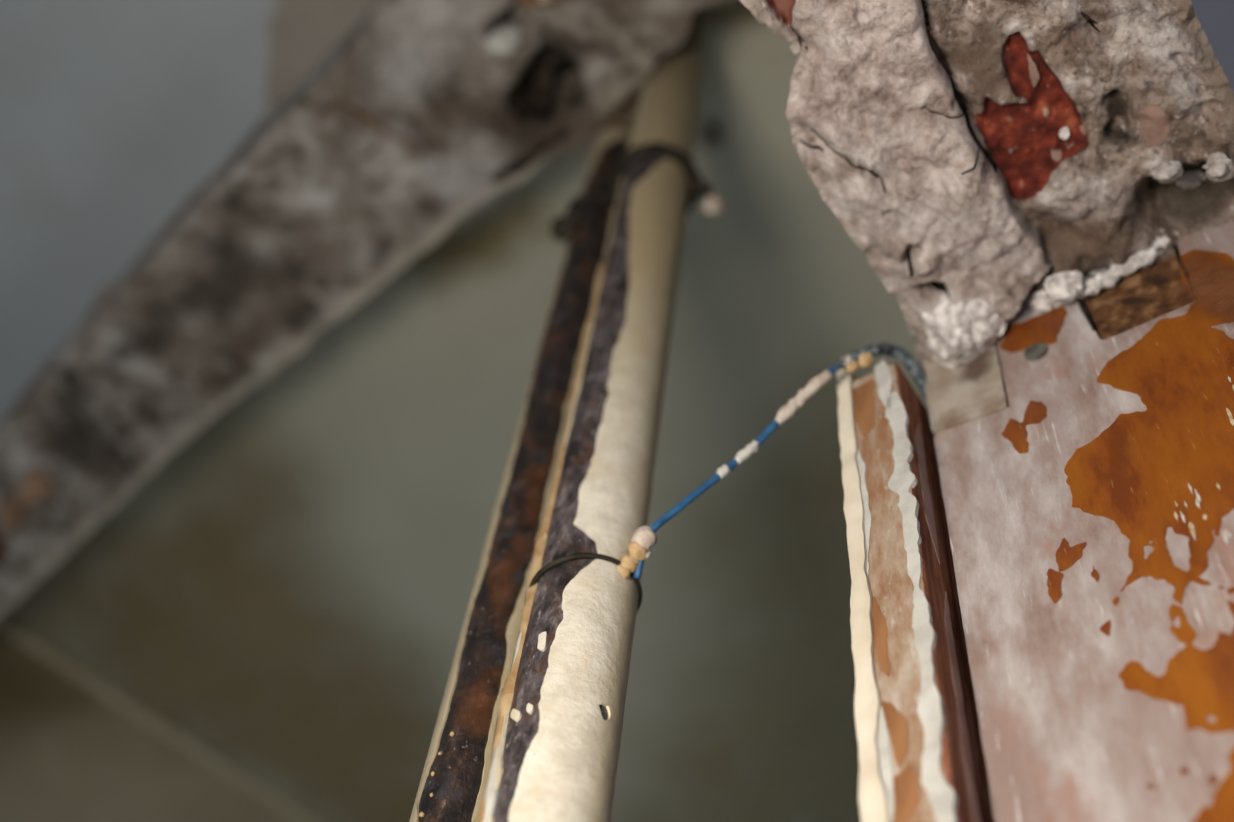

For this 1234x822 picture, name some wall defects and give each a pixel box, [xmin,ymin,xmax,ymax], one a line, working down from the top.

flaking render [766,0,795,28]
crack [921,0,997,175]
flaking render [974,32,1087,200]
spalling [1105,90,1133,143]
peeling [1179,249,1234,284]
peeling [1000,305,1067,353]
peeling [1001,400,1047,454]
peeling [1064,303,1234,733]
peeling [1047,538,1087,604]
corrosion [459,670,503,732]
peeling [1193,749,1234,822]